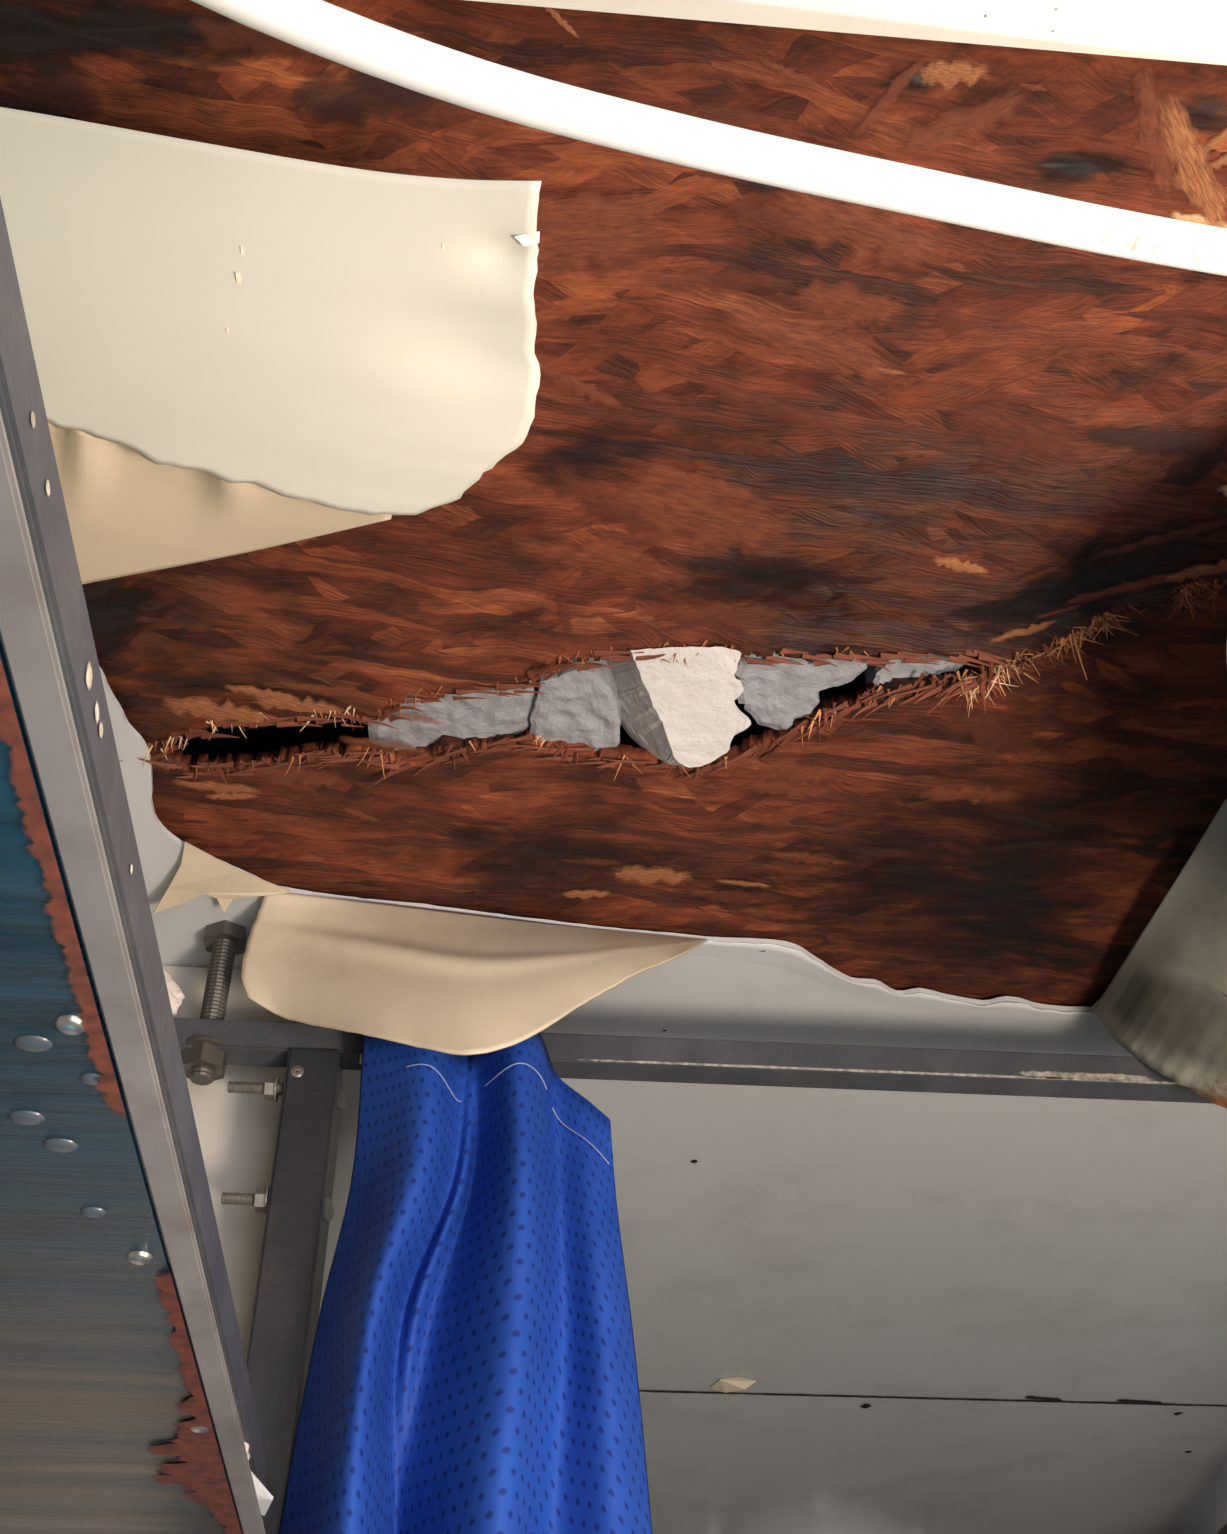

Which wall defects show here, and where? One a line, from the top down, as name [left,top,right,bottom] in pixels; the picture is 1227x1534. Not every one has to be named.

peeling [153,842,708,1055]
corrosion [1203,1094,1227,1109]
corrosion [147,1273,242,1534]